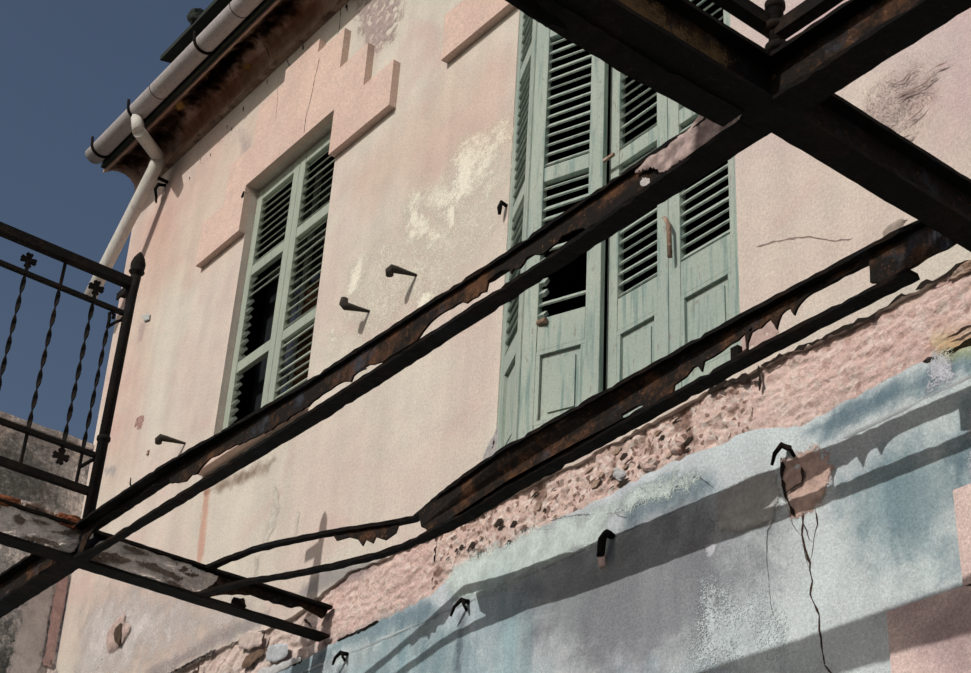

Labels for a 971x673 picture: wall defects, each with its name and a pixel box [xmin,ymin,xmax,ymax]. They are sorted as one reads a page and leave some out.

water stain [149,0,290,138]
rust [619,0,736,70]
water stain [109,143,143,170]
crack [757,236,853,247]
efflorescence [924,344,965,395]
spalling [179,260,971,673]
water stain [314,604,488,673]
water stain [443,465,706,603]
water stain [663,543,837,673]
crack [766,510,832,673]